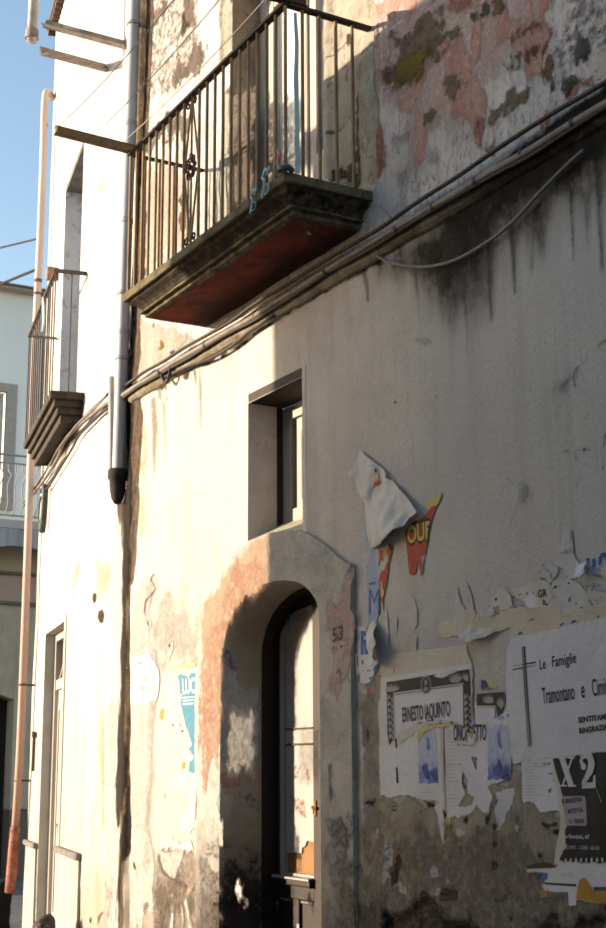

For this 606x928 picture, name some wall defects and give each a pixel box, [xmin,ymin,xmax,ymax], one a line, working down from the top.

spalling [219,0,233,61]
spalling [216,92,229,223]
damp [394,127,606,318]
damp [501,85,606,162]
peeling [138,319,193,379]
peeling [197,536,270,846]
peeling [356,675,606,928]
peeling [154,849,196,928]